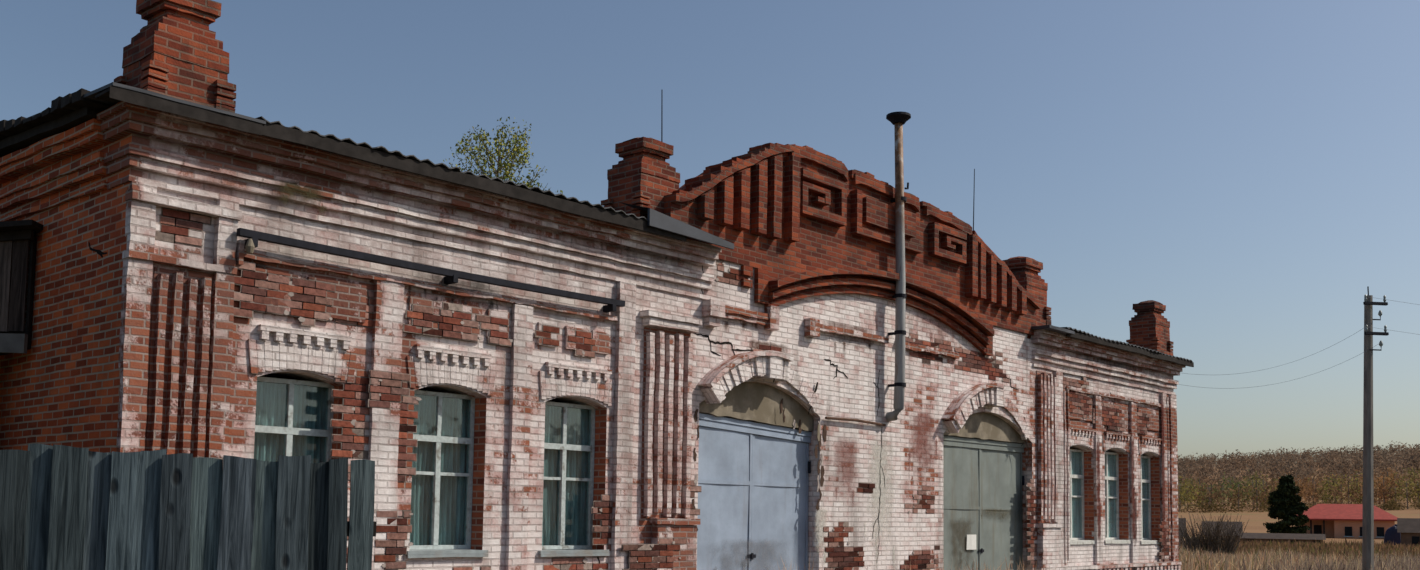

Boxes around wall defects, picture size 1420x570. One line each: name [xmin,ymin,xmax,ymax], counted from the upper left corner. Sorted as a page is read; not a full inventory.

peeling [155,207,212,248]
peeling [234,261,374,328]
crack [694,333,753,356]
peeling [330,370,422,482]
spalling [775,398,827,510]
peeling [1063,377,1151,435]
peeling [543,409,702,570]
peeling [823,522,864,570]
peeling [904,486,935,514]
peeling [900,545,940,570]
peeling [1025,479,1038,564]